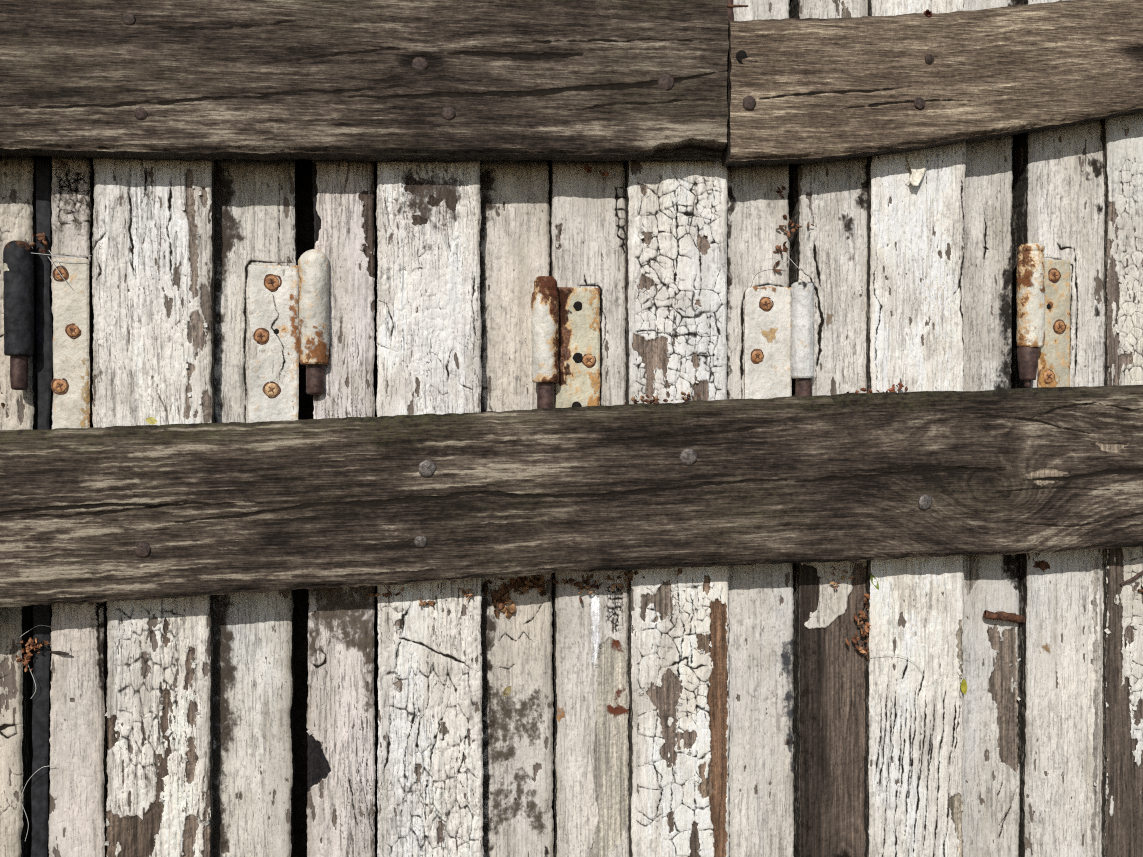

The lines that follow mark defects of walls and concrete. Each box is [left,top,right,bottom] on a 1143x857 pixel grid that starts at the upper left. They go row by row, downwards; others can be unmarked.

crack [0,71,963,111]
corrosion [288,294,329,365]
corrosion [536,276,600,386]
crack [580,275,606,405]
crack [615,177,824,400]
corrosion [1017,261,1045,293]
corrosion [1017,329,1060,387]
peeling [105,646,200,857]
crack [348,601,545,857]
peeling [589,575,729,857]
peeling [987,624,1021,772]
peeling [1090,548,1143,857]